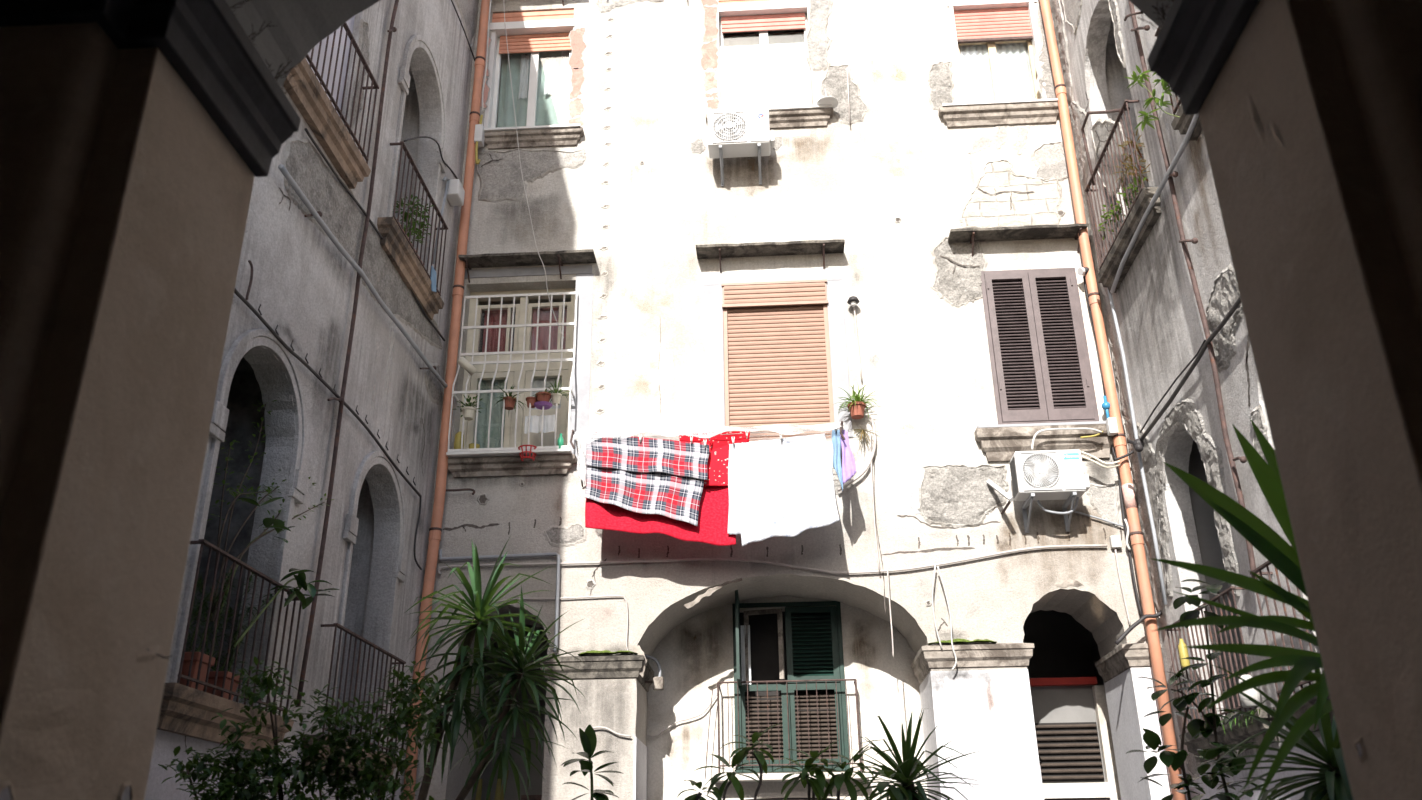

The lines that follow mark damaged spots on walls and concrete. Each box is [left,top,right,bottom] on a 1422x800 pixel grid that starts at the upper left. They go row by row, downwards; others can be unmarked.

flaking render [455,0,492,109]
flaking render [475,0,665,203]
peeling [700,0,720,109]
flaking render [805,0,869,125]
flaking render [917,0,1226,623]
flaking render [1205,263,1243,373]
flaking render [1214,510,1240,598]